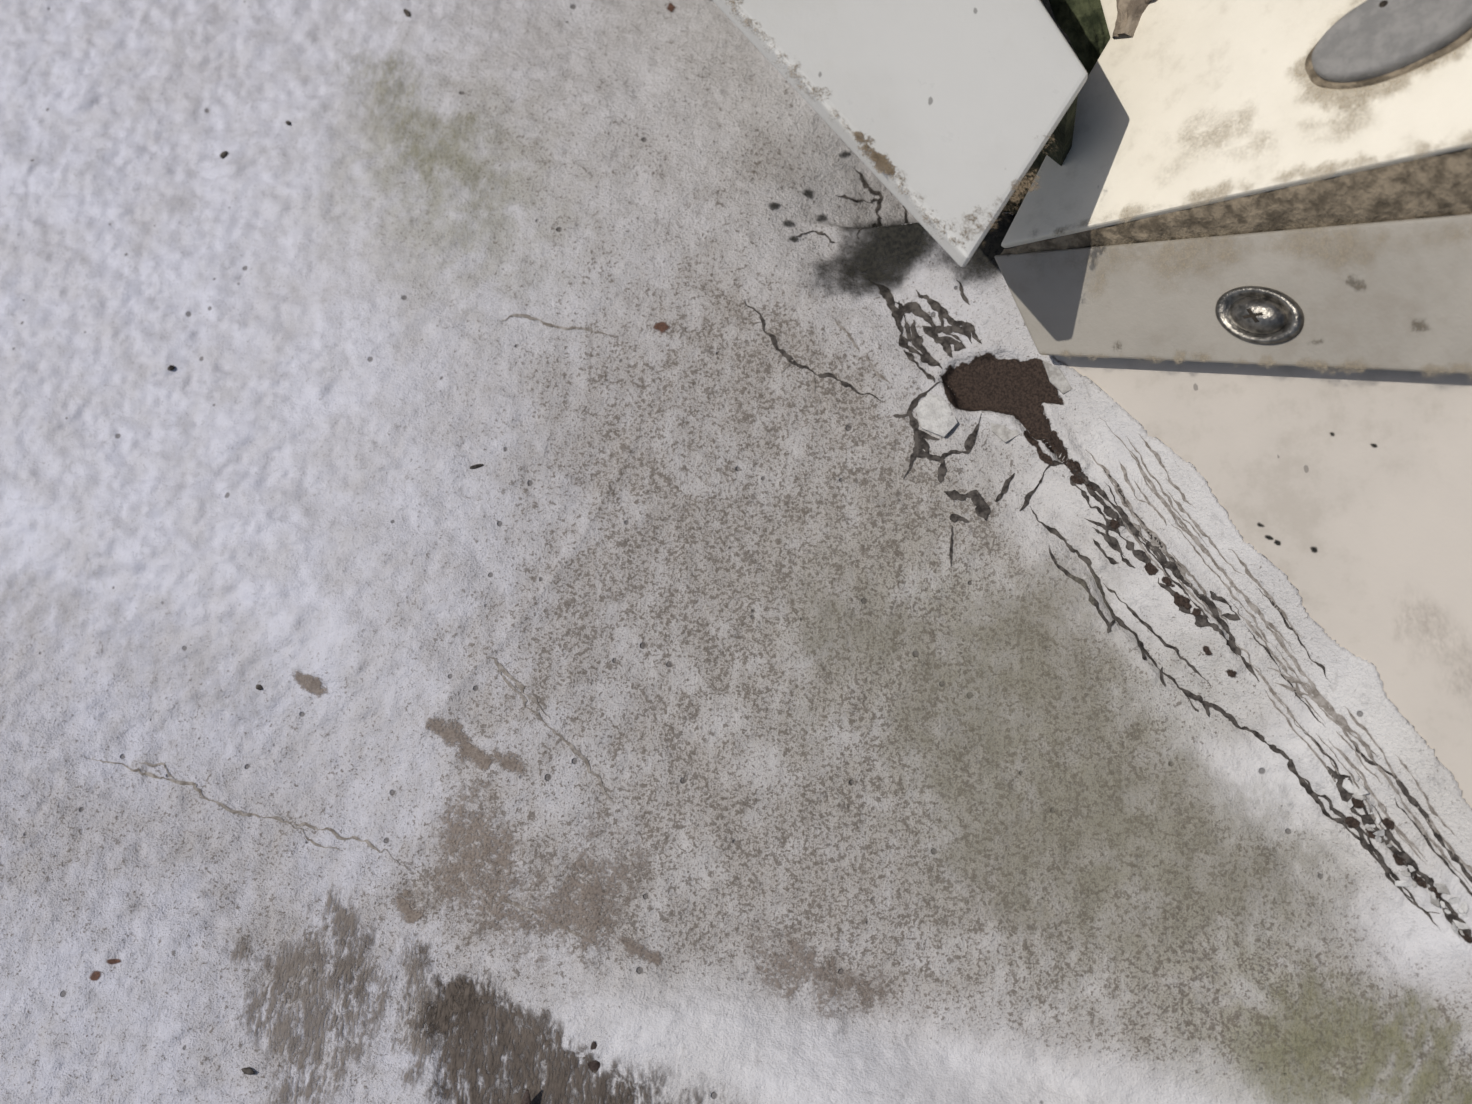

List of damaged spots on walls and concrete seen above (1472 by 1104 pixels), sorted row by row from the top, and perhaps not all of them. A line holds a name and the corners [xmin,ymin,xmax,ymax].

peeling [915,353,1096,491]
crack [730,279,1472,932]
crack [84,756,403,866]
peeling [1326,766,1472,943]
leakage [324,889,372,1028]
leakage [399,947,440,1086]